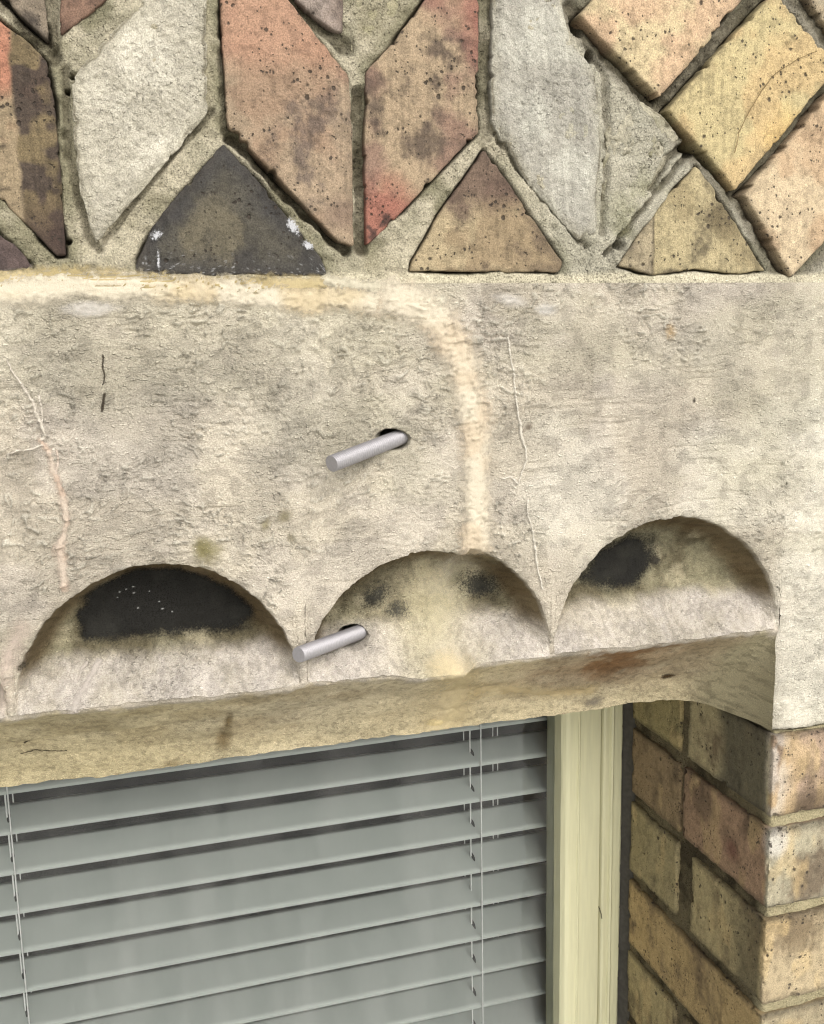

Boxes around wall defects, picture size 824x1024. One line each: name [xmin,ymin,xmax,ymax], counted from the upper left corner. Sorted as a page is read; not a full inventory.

crack [0,266,543,591]
crack [428,660,593,730]